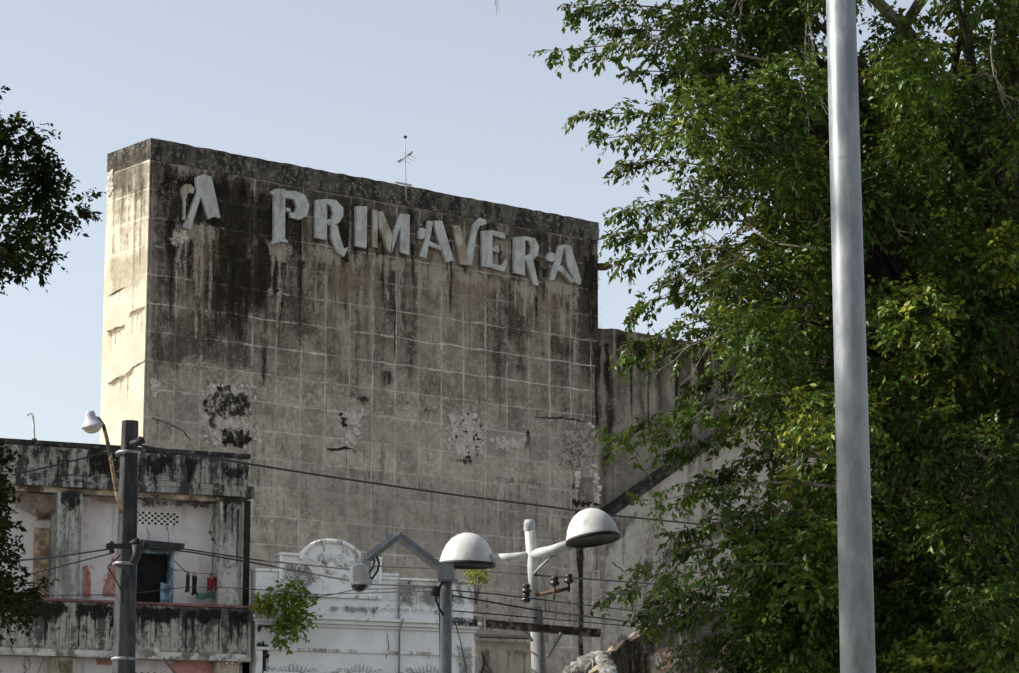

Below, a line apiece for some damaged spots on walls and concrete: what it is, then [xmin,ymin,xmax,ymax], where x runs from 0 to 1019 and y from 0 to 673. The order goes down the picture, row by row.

leakage [158,162,500,369]
leakage [512,230,633,473]
leakage [645,341,689,416]
leakage [138,454,202,483]
leakage [141,498,211,508]
peeling [198,379,262,450]
leakage [223,462,249,566]
peeling [339,408,364,446]
peeling [445,410,531,462]
leakage [10,602,114,647]
leakage [576,548,584,656]